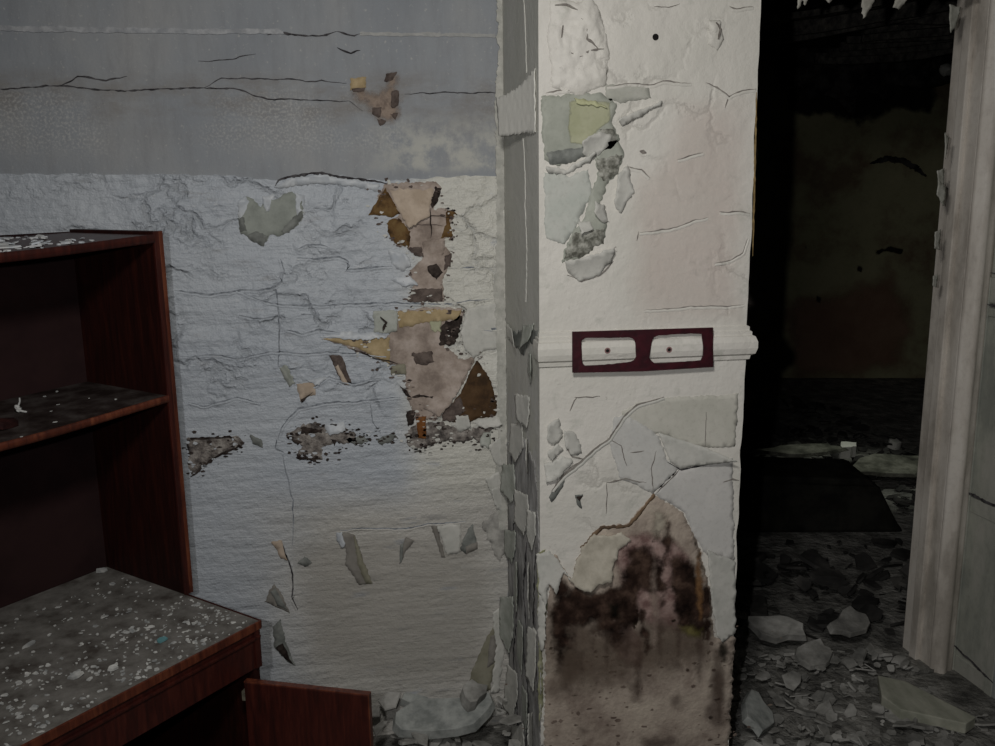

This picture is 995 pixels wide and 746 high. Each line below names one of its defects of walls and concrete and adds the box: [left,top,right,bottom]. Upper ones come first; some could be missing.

peeling [861,0,875,18]
crack [267,31,362,54]
crack [1,54,361,110]
crack [413,88,494,96]
peeling [496,0,662,302]
crack [274,172,387,192]
peeling [237,192,305,247]
crack [174,244,490,611]
spalling [182,430,263,487]
spalling [280,178,741,746]
peeling [265,584,296,666]
water stain [552,522,711,682]